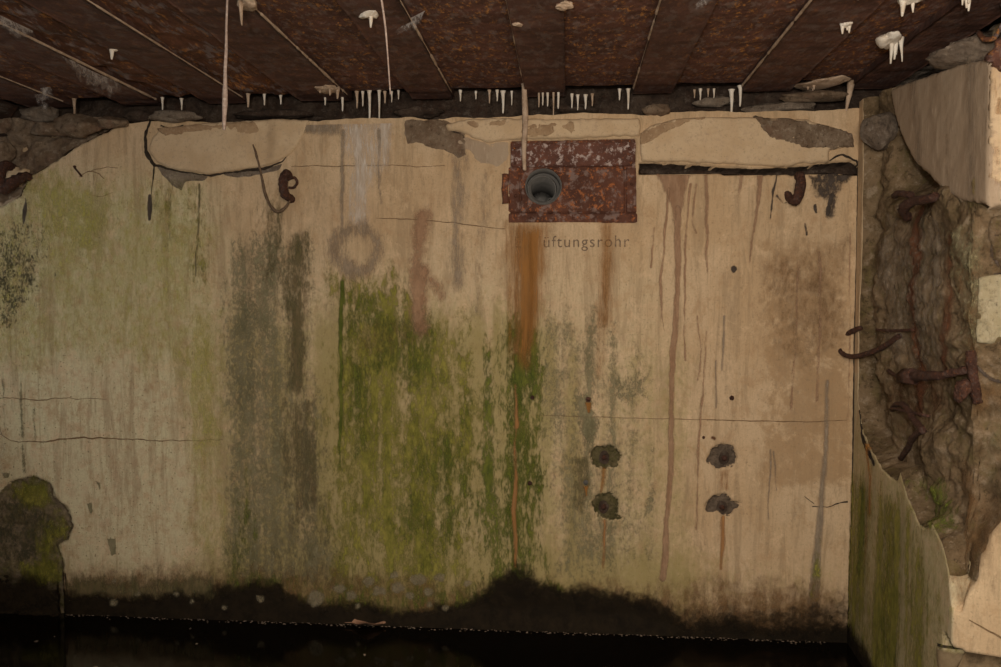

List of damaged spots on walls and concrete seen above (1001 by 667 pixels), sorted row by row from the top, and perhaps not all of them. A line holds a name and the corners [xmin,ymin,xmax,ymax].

water stain [897,0,923,17]
water stain [839,22,853,34]
water stain [875,31,905,64]
spalling [0,113,150,207]
rust [510,226,543,363]
spalling [639,86,1001,581]
crack [0,395,98,403]
water stain [0,167,873,667]
crack [0,428,223,443]
crack [969,620,1001,639]
crack [937,642,963,650]
water stain [937,649,1001,667]